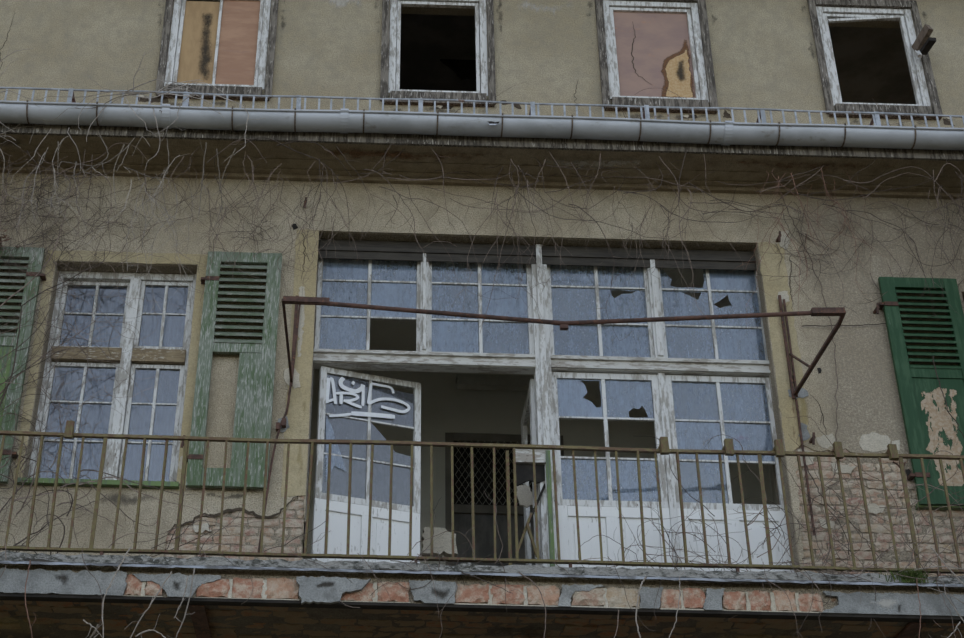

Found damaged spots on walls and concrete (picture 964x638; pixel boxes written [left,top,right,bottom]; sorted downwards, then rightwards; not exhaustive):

peeling [921,387,964,486]
flaking render [164,491,306,561]
flaking render [660,432,964,613]
spalling [123,574,163,597]
spalling [195,577,299,601]
spalling [340,568,415,603]
spalling [427,570,560,607]
spalling [571,587,640,609]